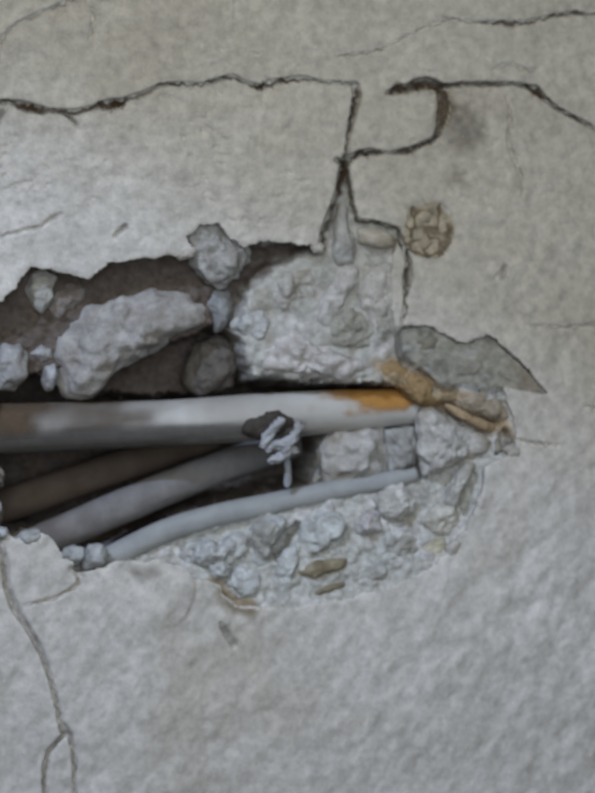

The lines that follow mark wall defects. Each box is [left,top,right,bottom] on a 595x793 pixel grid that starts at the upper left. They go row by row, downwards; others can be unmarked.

crack [481,11,595,26]
crack [155,76,314,90]
crack [0,97,130,123]
crack [388,79,584,124]
crack [321,88,436,315]
spalling [0,155,547,608]
corrosion [332,388,413,410]